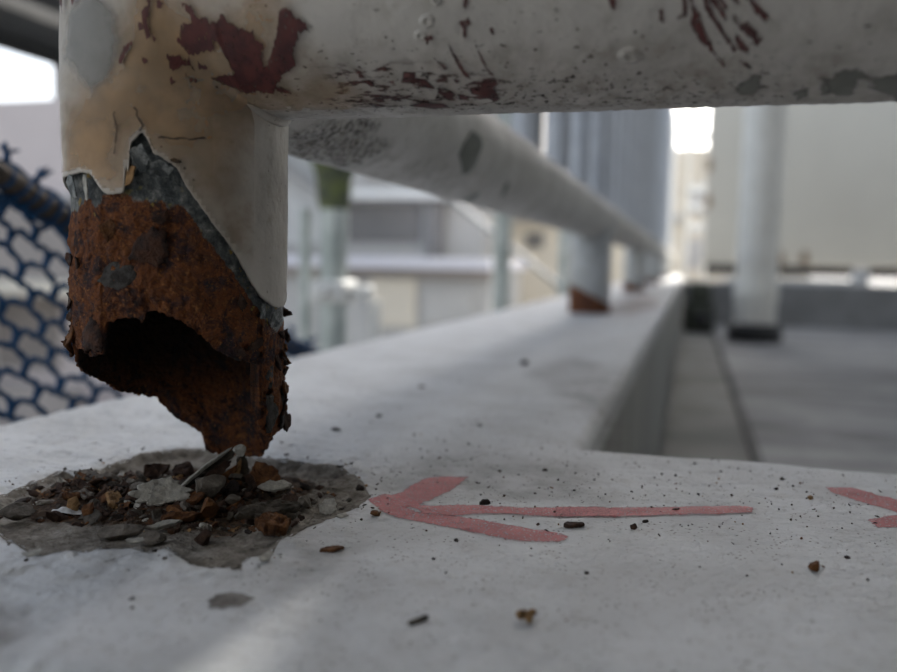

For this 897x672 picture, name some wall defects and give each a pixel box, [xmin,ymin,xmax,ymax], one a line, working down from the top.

peeling [66,0,114,87]
peeling [167,55,207,85]
peeling [821,70,897,102]
peeling [125,144,150,186]
peeling [66,174,89,201]
spalling [93,448,218,479]
spalling [0,454,371,568]